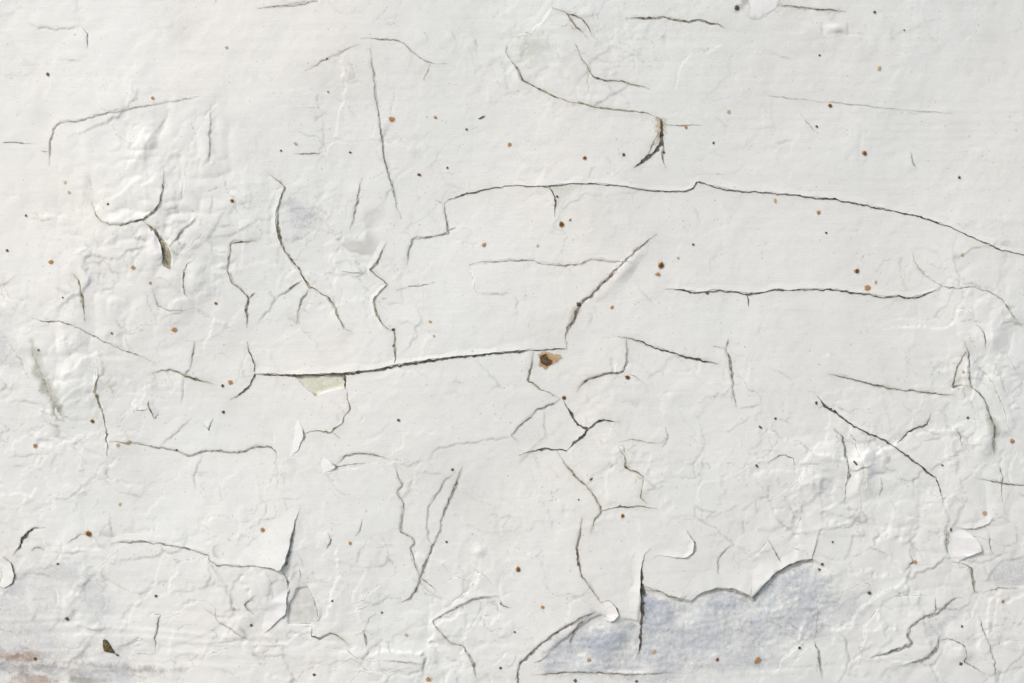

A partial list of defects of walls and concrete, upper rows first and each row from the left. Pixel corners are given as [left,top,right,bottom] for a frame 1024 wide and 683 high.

crack [3,96,211,163]
crack [93,173,164,226]
crack [152,217,197,311]
peeling [143,221,209,269]
crack [32,274,276,463]
peeling [296,374,345,394]
corrosion [539,352,561,369]
crack [227,8,1024,683]
crack [14,528,44,554]
crack [110,533,289,586]
peeling [600,510,696,655]